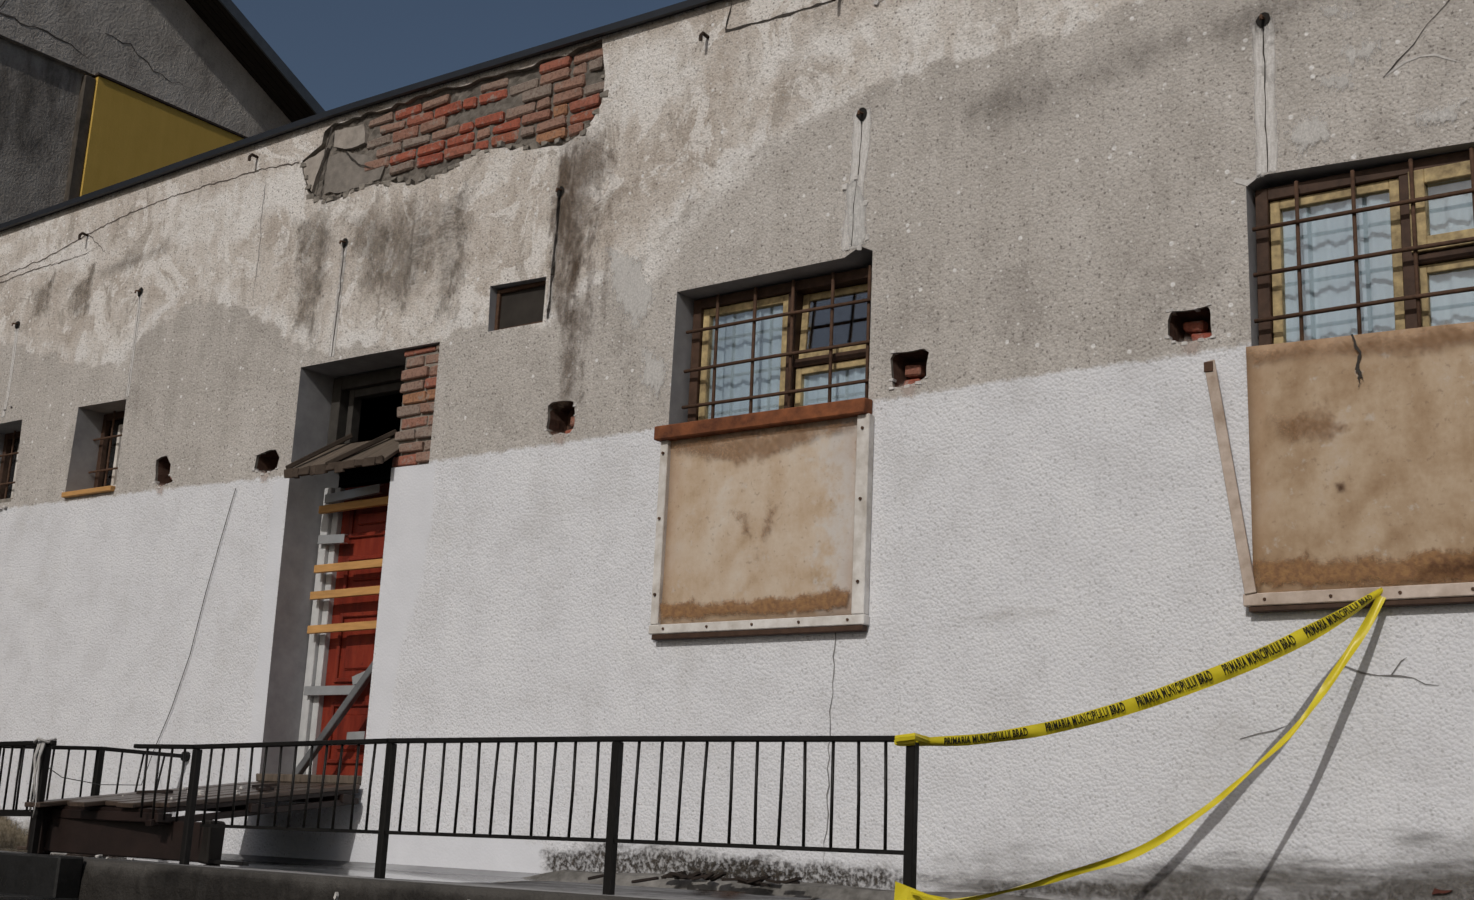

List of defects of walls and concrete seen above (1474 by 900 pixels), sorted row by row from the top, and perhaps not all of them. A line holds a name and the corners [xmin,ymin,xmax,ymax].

crack [725,0,832,32]
flaking render [300,43,609,204]
crack [0,162,299,291]
leakage [557,148,603,317]
hole [1164,303,1216,352]
hole [889,350,929,395]
hole [544,401,577,443]
hole [153,457,174,492]
leakage [0,816,28,849]